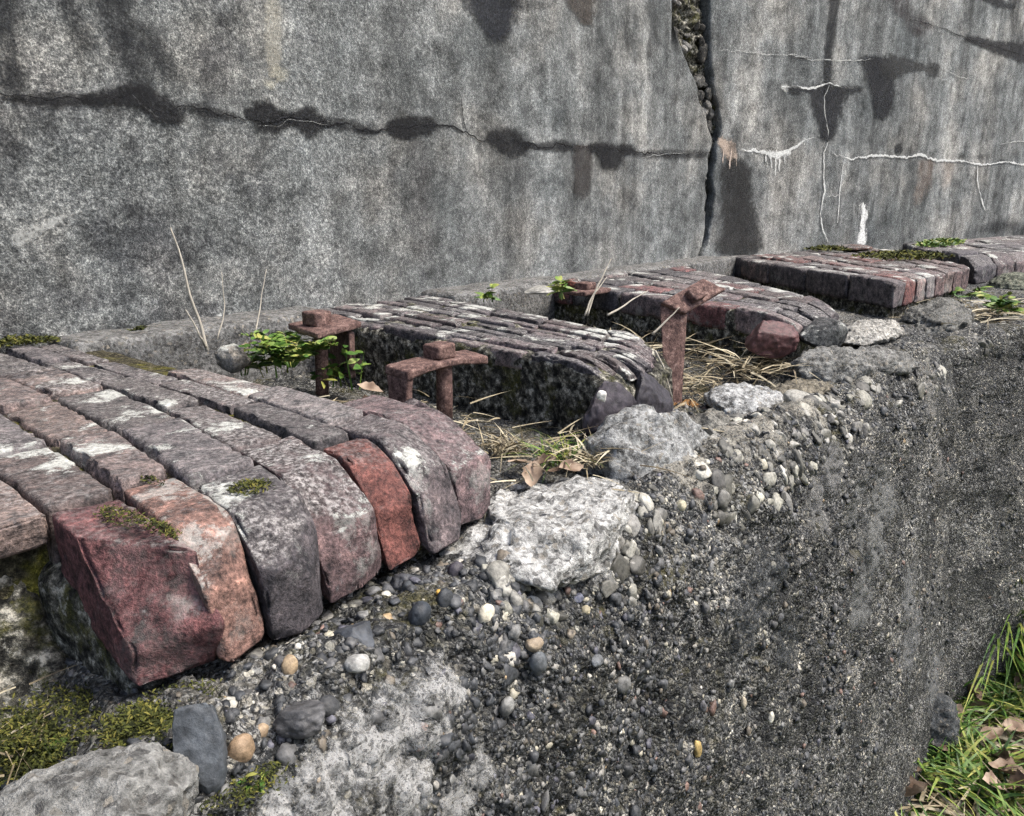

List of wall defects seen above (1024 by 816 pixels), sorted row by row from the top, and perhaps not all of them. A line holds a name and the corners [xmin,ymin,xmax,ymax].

water stain [463,0,534,42]
water stain [568,0,595,24]
water stain [0,0,437,139]
water stain [788,0,940,142]
crack [235,96,536,145]
crack [636,0,1024,241]
water stain [487,128,702,196]
water stain [716,131,763,256]
efflorescence [857,203,868,245]